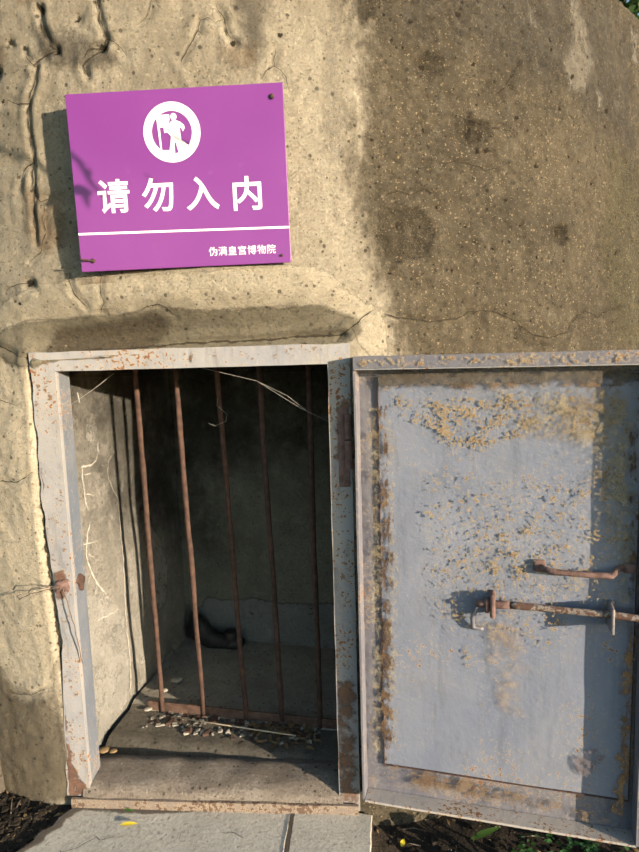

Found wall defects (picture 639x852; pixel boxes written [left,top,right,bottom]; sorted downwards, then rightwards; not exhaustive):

crack [83,0,127,77]
crack [181,6,236,61]
crack [8,11,60,261]
leakage [357,0,639,355]
crack [80,308,617,351]
rust [47,513,72,605]
rust [359,353,639,779]
rust [65,712,87,796]
rust [337,665,359,802]
leakage [356,636,442,826]
rust [411,772,528,803]
rust [606,627,638,822]